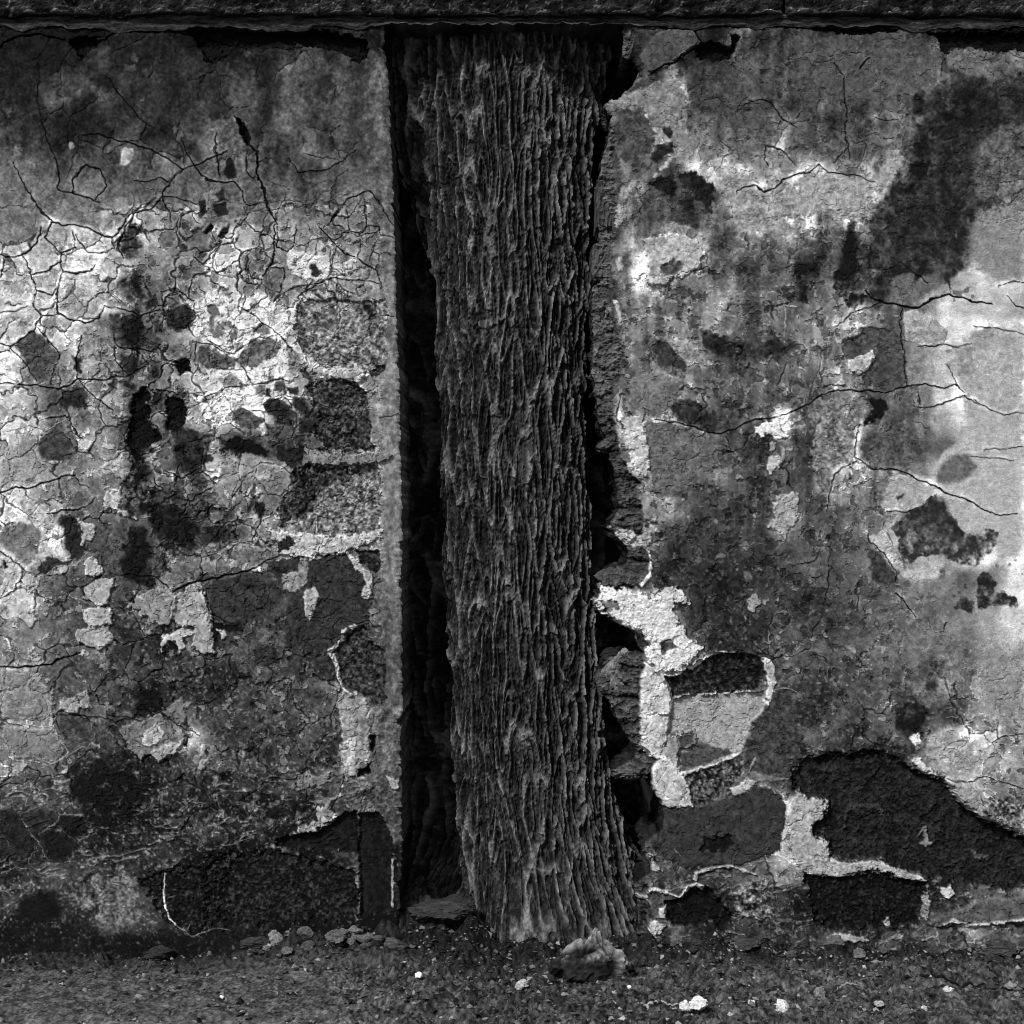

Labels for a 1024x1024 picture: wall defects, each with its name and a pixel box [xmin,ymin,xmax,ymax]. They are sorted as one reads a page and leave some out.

crack [1,117,394,406]
crack [742,138,849,193]
leakage [833,77,1024,308]
leakage [119,271,163,578]
peeling [620,415,651,478]
crack [665,282,1013,434]
crack [134,556,280,623]
spalling [266,298,393,789]
leakage [893,496,1018,612]
peeling [386,775,400,790]
spalling [594,520,1024,945]
spalling [138,803,395,934]